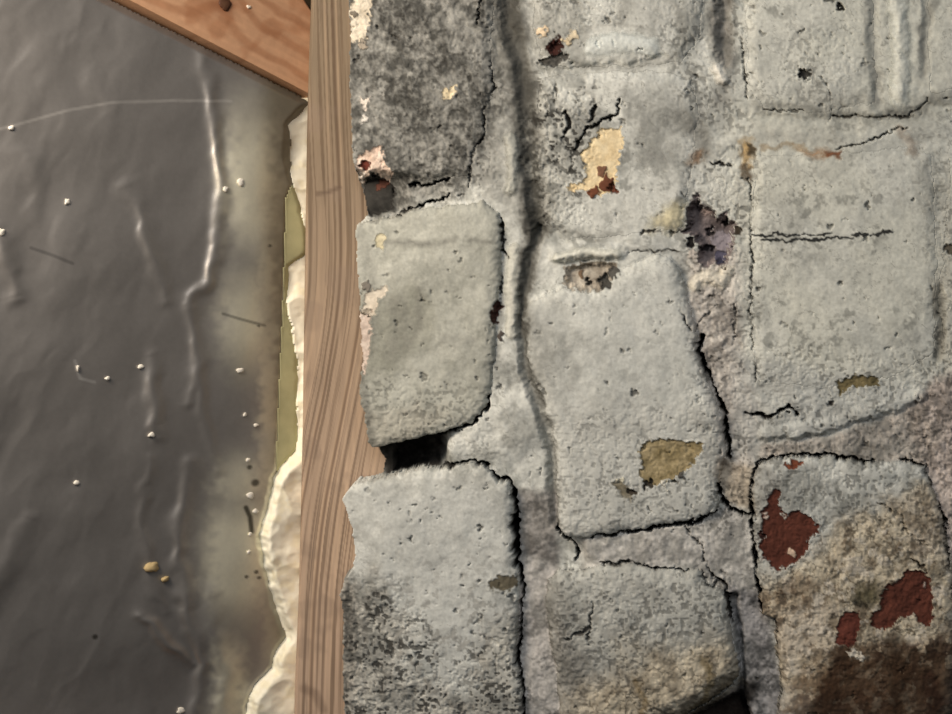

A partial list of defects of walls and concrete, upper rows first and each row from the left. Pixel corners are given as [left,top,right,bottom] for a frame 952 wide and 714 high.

crack [555,87,621,151]
peeling [568,126,624,198]
spalling [680,193,743,268]
spalling [562,261,620,293]
crack [684,224,799,457]
crack [441,395,491,433]
peeling [827,373,880,405]
peeling [611,438,703,502]
crack [752,451,874,481]
crack [440,459,526,714]
crack [556,482,763,621]
damp [812,639,944,714]